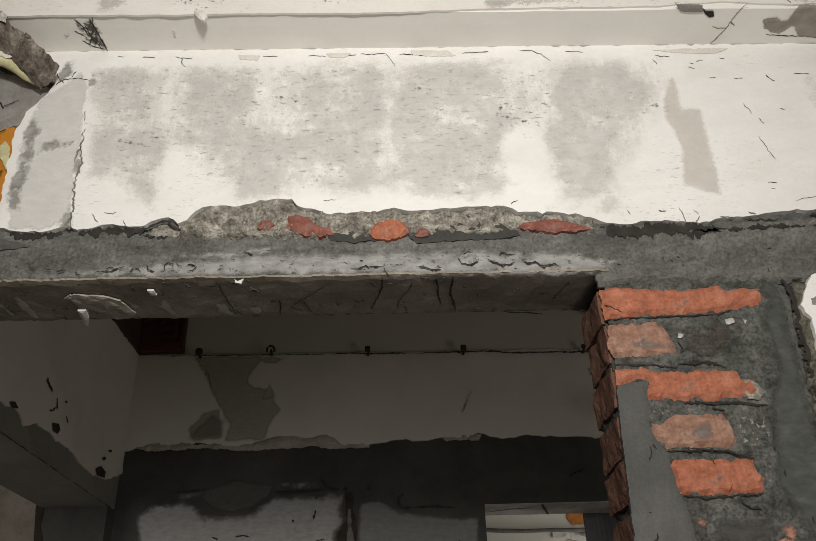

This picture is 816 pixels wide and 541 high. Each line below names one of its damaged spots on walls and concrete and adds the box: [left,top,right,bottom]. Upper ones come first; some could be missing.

crack [710,4,747,44]
peeling [200,73,364,184]
peeling [497,71,549,131]
peeling [0,127,16,202]
spalling [149,199,599,244]
spalling [743,380,764,401]